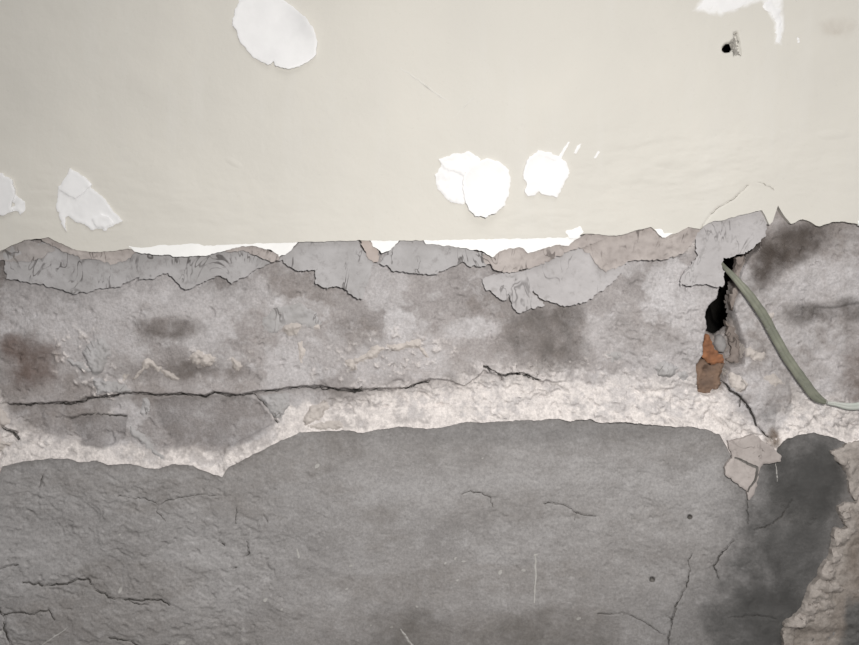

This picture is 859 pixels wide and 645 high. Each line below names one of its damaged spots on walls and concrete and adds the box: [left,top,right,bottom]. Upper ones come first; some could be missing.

crack [483,365,539,380]
crack [11,380,430,423]
spalling [0,210,859,645]
crack [1,565,170,606]
crack [598,555,692,643]
crack [0,609,55,643]